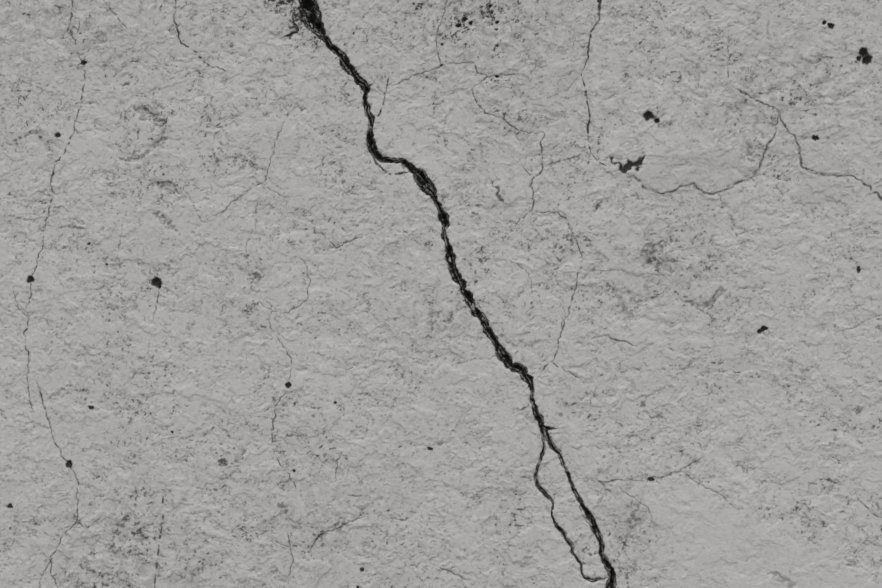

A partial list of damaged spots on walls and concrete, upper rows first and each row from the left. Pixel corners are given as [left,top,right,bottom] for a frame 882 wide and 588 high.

crack [282,0,617,588]